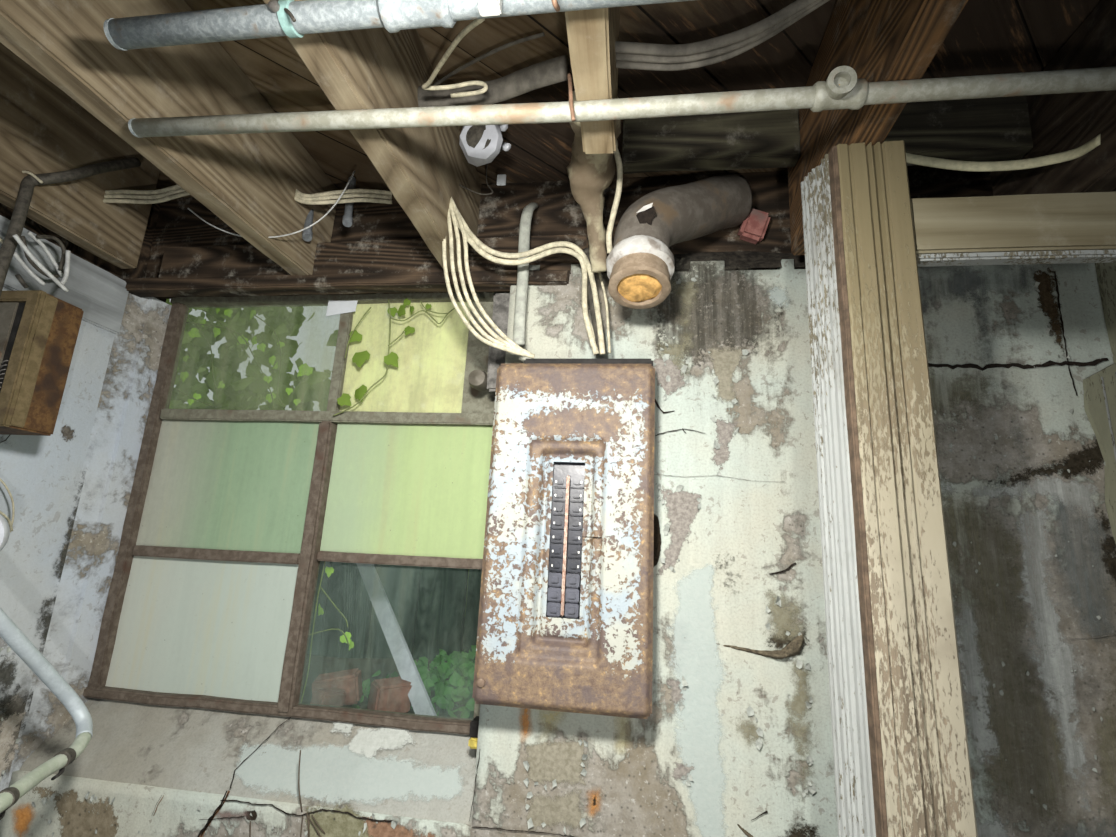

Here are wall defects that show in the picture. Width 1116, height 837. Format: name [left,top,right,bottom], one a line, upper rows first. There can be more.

flaking render [653,275,698,400]
crack [928,272,1109,396]
peeling [61,425,76,442]
flaking render [708,347,749,476]
flaking render [653,484,702,576]
damp [1052,503,1116,636]
damp [942,497,1073,823]
flaking render [0,711,26,782]
flaking render [31,786,119,837]
crack [197,704,393,837]
spalling [358,813,440,837]
flaking render [786,656,816,797]